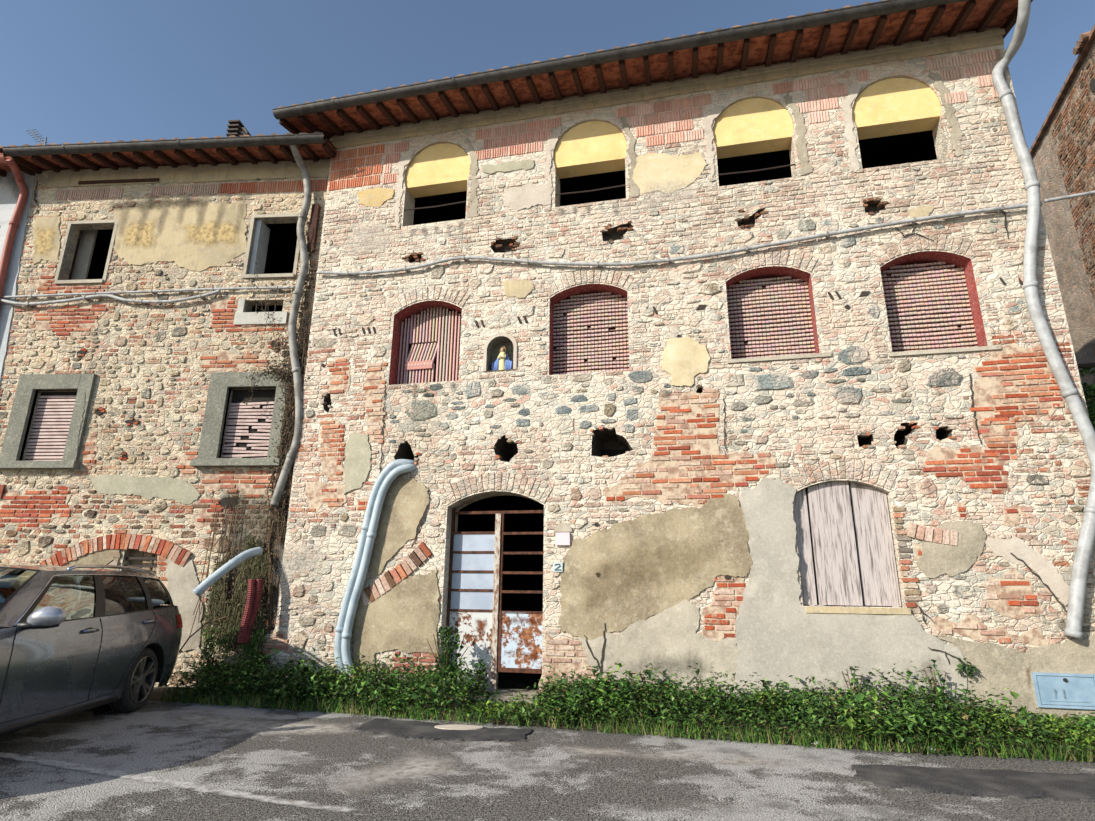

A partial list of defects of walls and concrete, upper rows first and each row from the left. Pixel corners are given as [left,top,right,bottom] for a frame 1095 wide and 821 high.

flaking render [113,201,247,272]
spalling [490,236,520,253]
spalling [600,221,634,242]
spalling [735,208,768,229]
flaking render [305,353,369,513]
flaking render [362,361,388,444]
spalling [394,441,422,465]
spalling [491,435,521,462]
flaking render [538,337,1095,728]
flaking render [351,478,441,677]
corrosion [497,612,542,674]